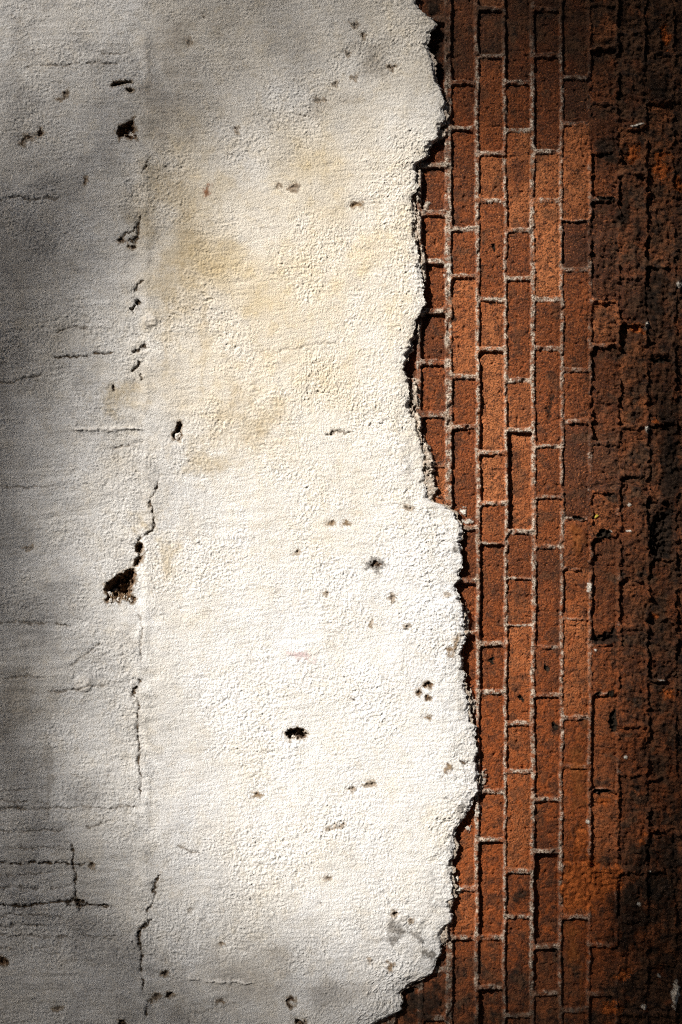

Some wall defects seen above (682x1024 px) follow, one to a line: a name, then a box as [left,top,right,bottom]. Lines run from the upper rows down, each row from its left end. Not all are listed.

spalling [404,2,465,565]
crack [136,482,158,564]
spalling [416,680,433,701]
spalling [446,579,480,819]
crack [1,845,109,910]
crack [137,874,161,1016]
spalling [392,829,460,1015]
spalling [556,823,624,912]